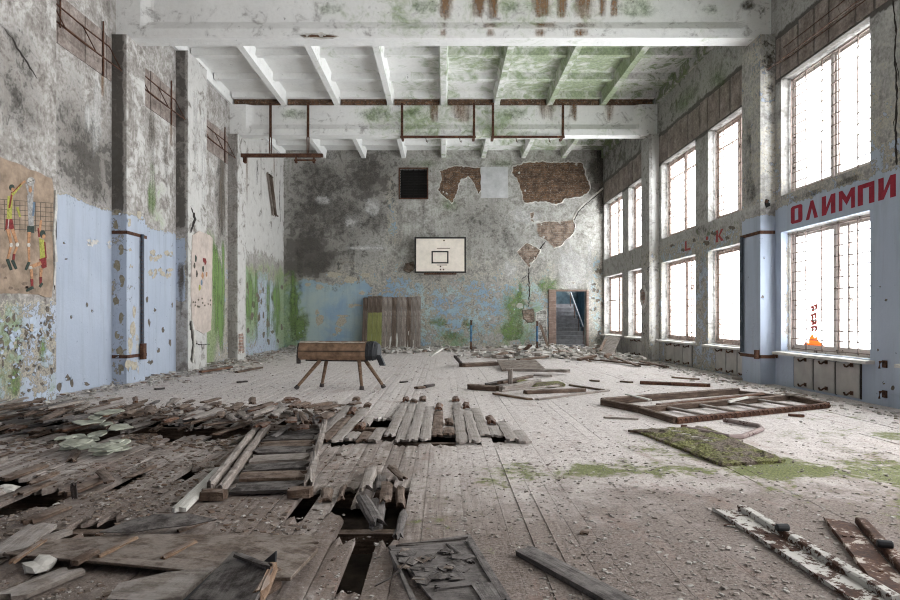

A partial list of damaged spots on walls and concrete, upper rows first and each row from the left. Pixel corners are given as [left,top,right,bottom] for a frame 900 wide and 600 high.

crack [4,28,37,78]
corrosion [440,0,451,35]
corrosion [473,0,497,35]
corrosion [532,0,617,36]
peeling [87,237,174,374]
water stain [212,244,225,351]
water stain [254,163,387,341]
spalling [437,165,481,204]
spalling [511,160,591,268]
crack [521,188,603,307]
peeling [0,306,54,398]
peeling [57,374,90,392]